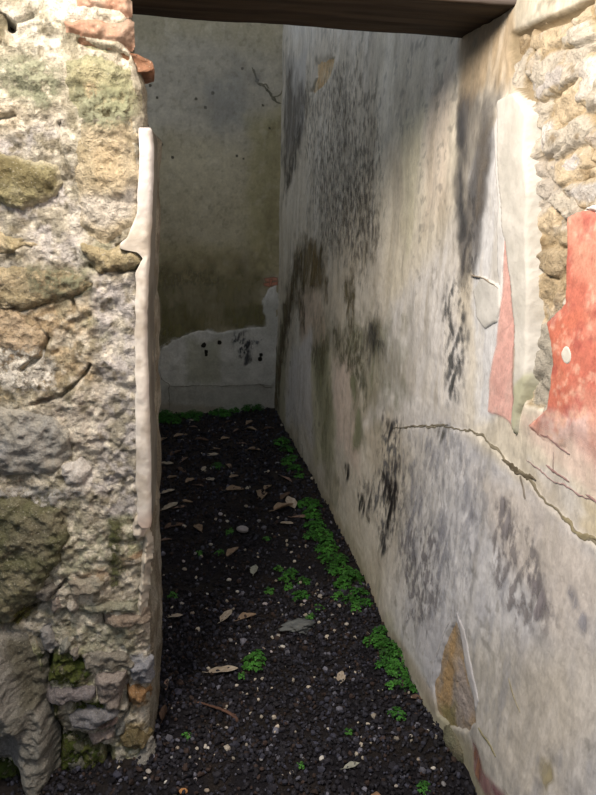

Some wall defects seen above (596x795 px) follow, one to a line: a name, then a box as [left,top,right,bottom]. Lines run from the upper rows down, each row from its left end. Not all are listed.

flaking render [120,127,278,616]
crack [252,68,282,104]
damp [274,248,306,409]
damp [281,66,378,259]
damp [312,280,380,448]
damp [444,97,499,396]
flaking render [488,0,596,447]
damp [358,417,439,623]
crack [395,424,596,545]
damp [492,497,549,625]
flaking render [427,611,479,731]